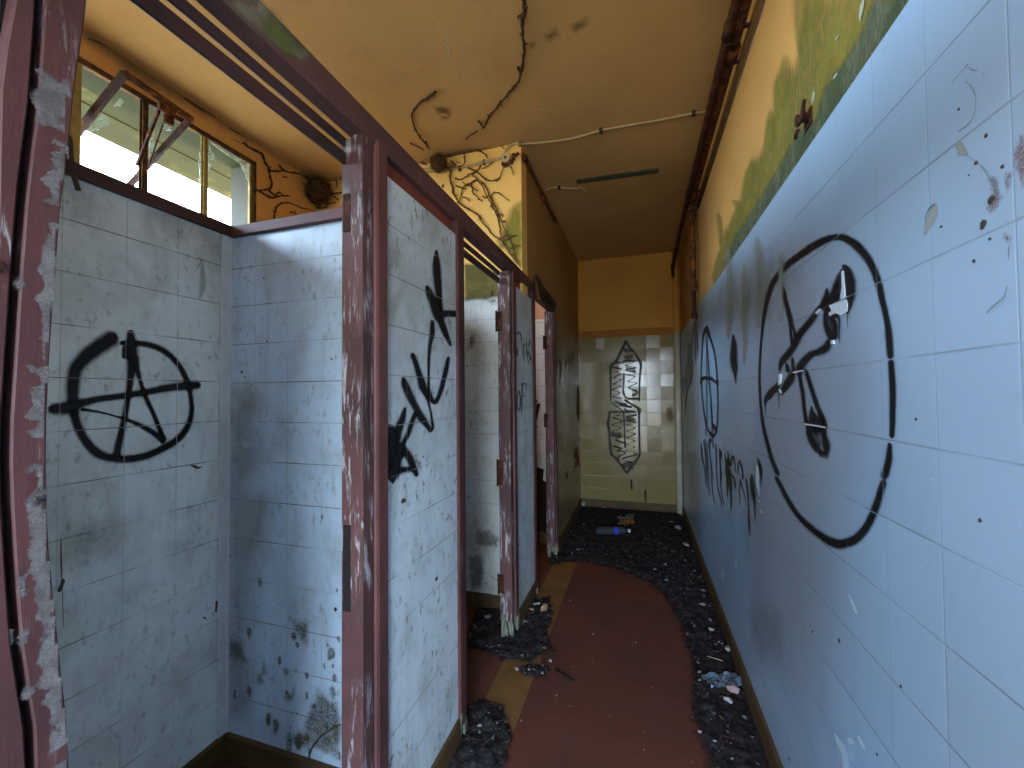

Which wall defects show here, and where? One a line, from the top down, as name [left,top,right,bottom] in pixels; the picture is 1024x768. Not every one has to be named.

peeling [31,68,71,206]
peeling [25,222,59,438]
peeling [9,464,69,768]
damp [292,623,307,647]
damp [266,636,341,759]